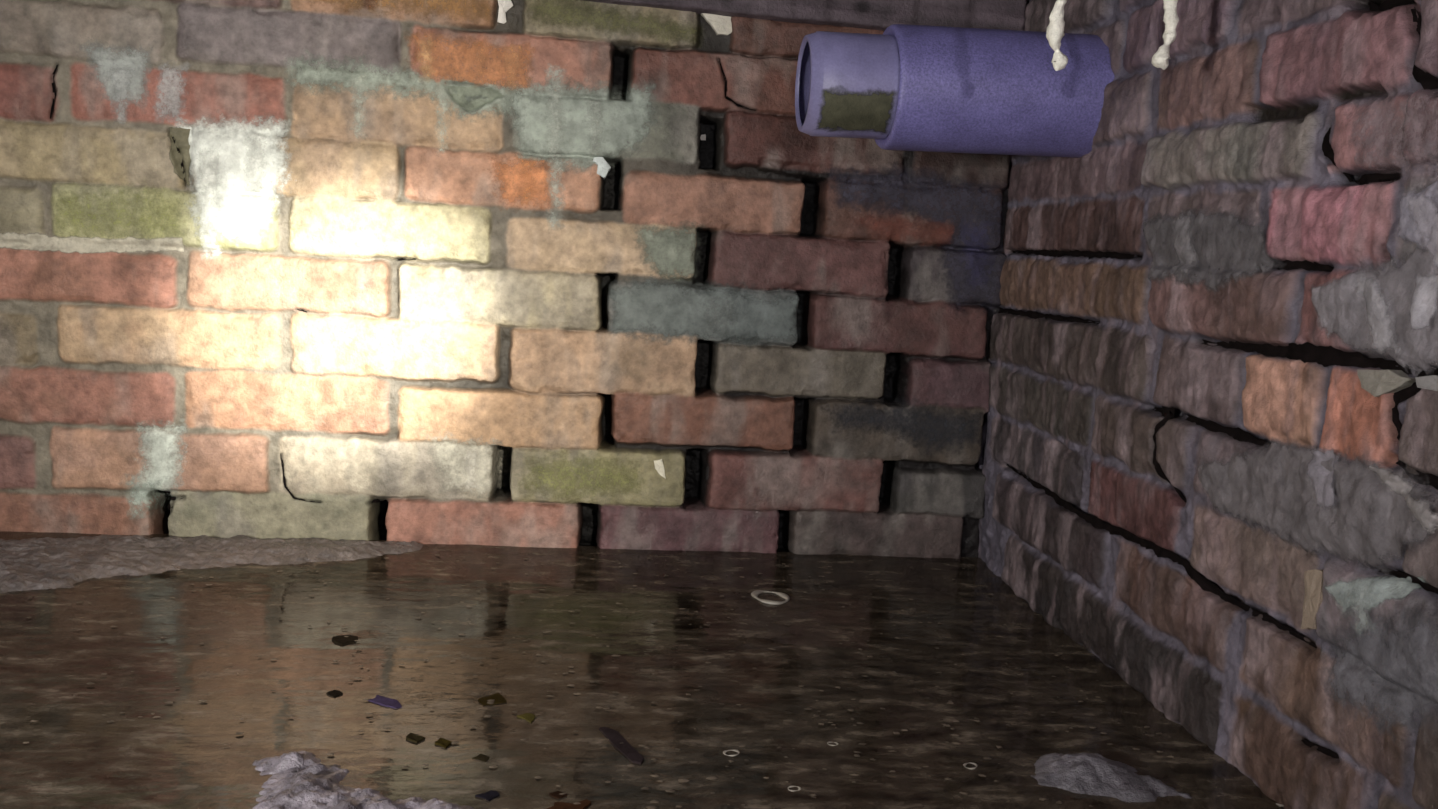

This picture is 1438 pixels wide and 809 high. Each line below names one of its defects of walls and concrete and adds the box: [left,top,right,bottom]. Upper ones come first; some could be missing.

crack [719,58,756,111]
crack [280,454,321,503]